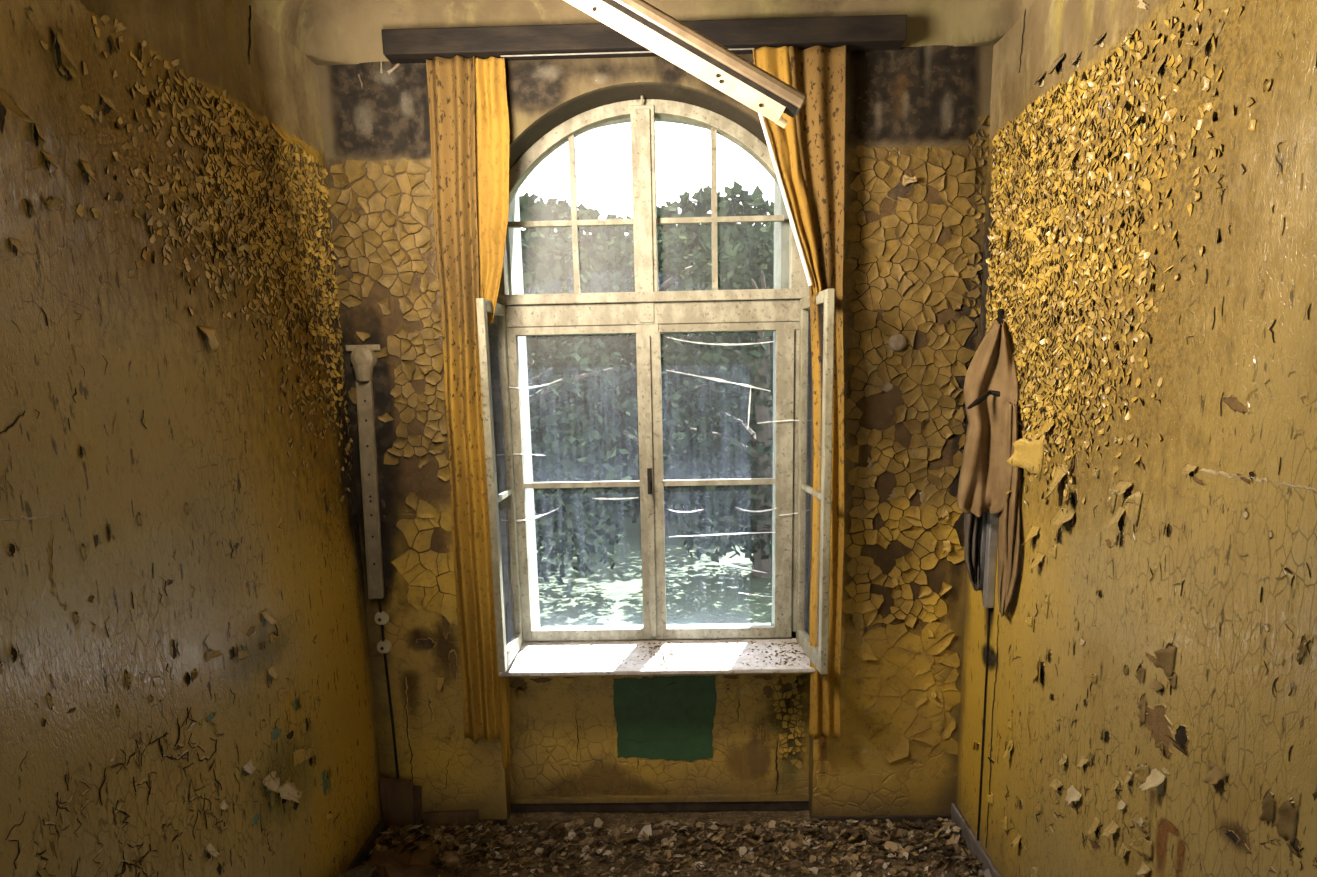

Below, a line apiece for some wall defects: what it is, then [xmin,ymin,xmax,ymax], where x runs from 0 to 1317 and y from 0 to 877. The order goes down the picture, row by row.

crack [0,307,108,435]
peeling [0,15,458,693]
peeling [841,0,1273,780]
crack [47,527,243,637]
peeling [1296,634,1307,665]
peeling [41,692,76,727]
crack [6,620,349,877]
crack [773,742,781,794]
peeling [1049,724,1111,808]
peeling [1259,788,1301,857]